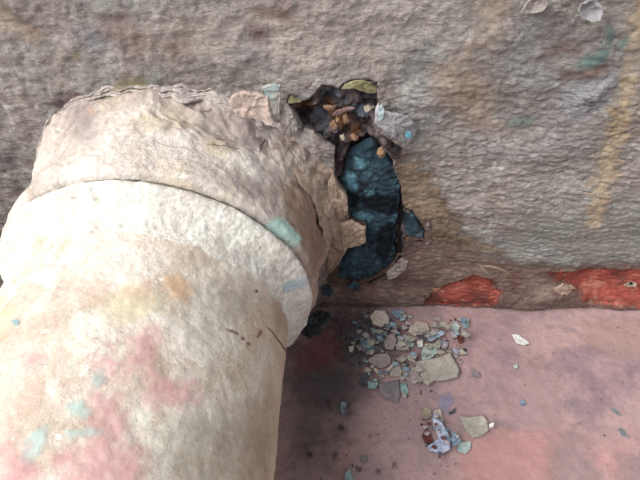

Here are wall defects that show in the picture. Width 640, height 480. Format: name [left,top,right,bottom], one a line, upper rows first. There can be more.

spalling [262,79,432,291]
peeling [424,275,502,307]
peeling [547,268,640,309]